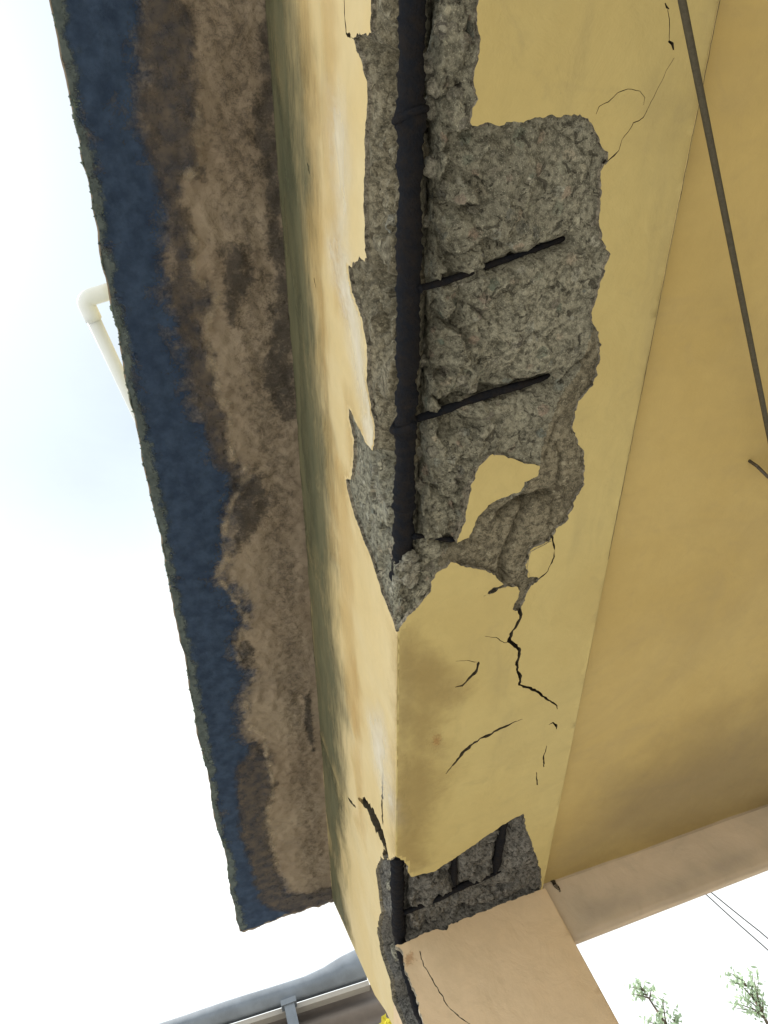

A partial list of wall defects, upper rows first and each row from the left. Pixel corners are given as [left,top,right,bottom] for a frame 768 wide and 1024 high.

leakage [62,0,333,932]
spalling [379,815,540,1024]
spalling [349,0,607,630]
crack [498,609,556,727]